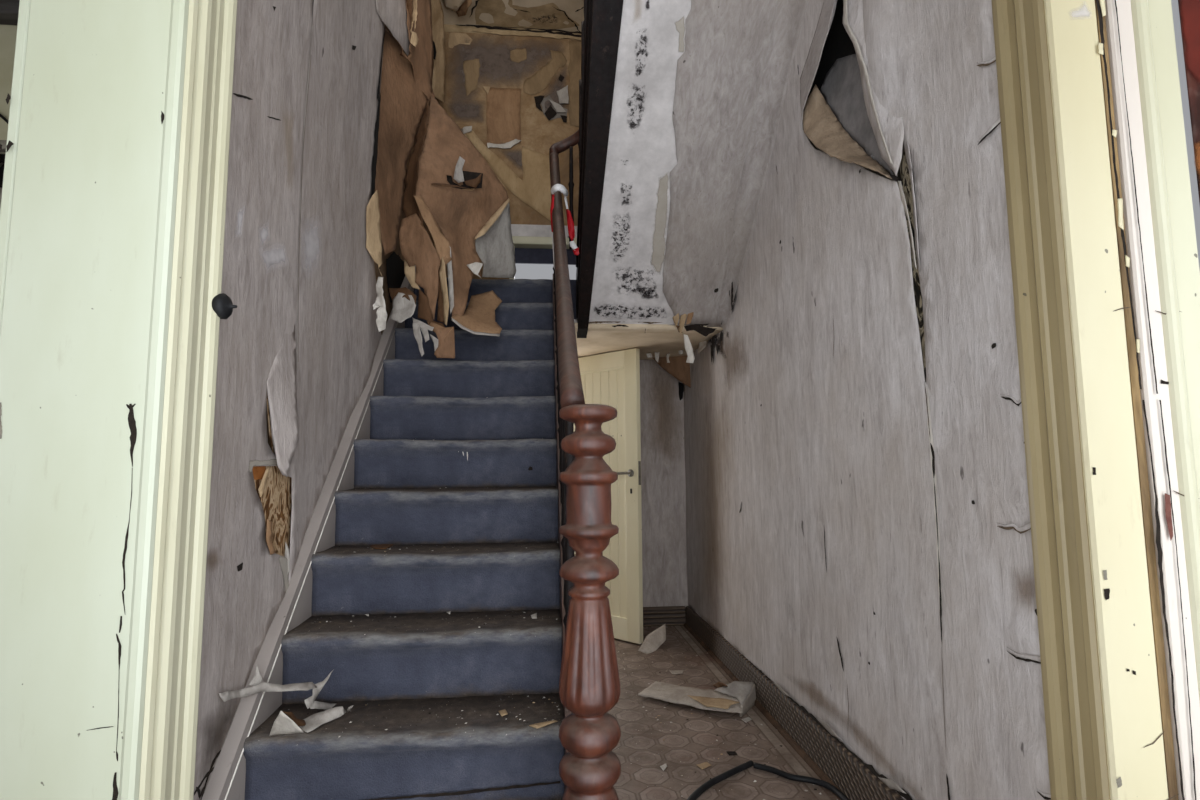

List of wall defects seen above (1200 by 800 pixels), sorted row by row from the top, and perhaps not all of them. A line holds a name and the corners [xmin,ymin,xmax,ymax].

peeling [443,0,581,127]
damp [628,30,648,129]
peeling [1181,0,1200,79]
peeling [466,130,551,221]
spalling [386,252,405,303]
damp [595,219,664,318]
crack [86,404,137,800]
crack [924,381,946,744]